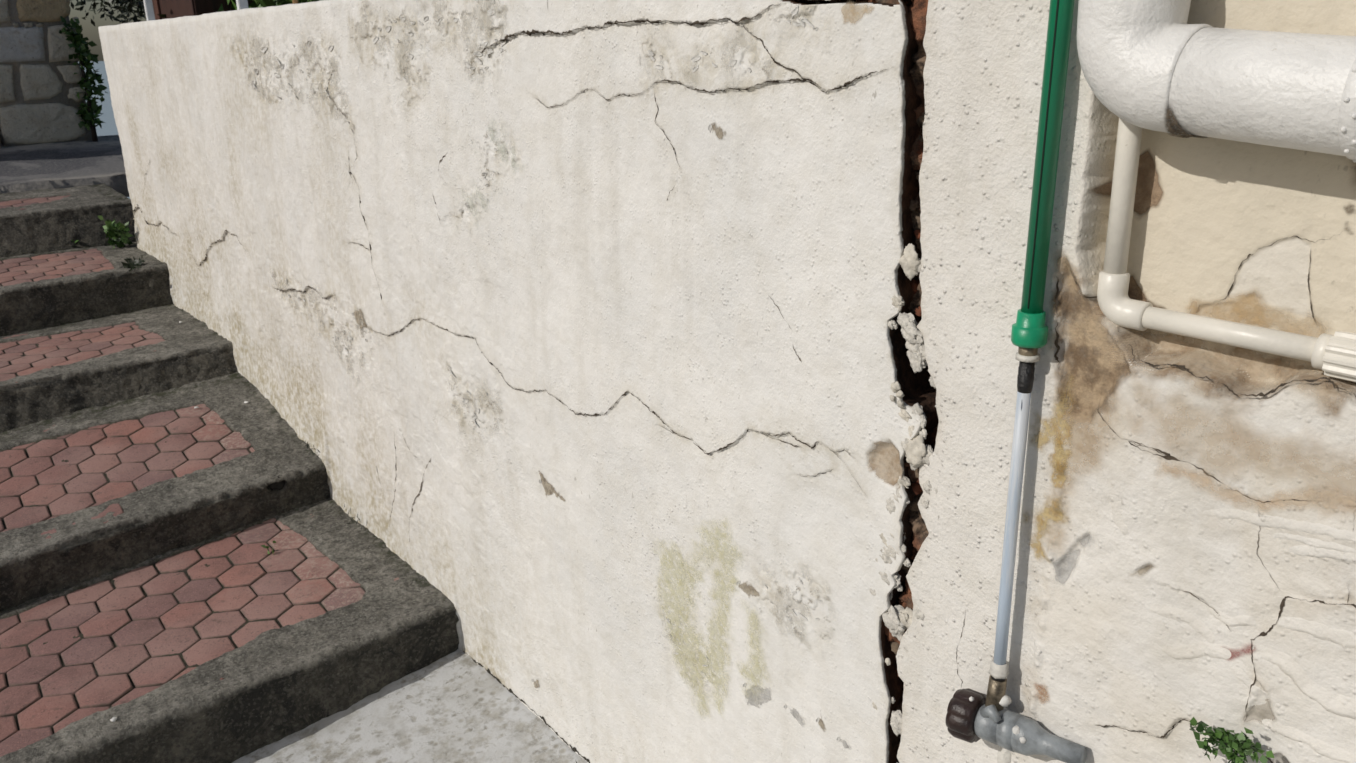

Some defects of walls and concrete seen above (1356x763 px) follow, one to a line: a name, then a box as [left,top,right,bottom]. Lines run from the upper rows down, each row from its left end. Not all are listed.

spalling [1093,181,1112,196]
spalling [1133,151,1163,215]
spalling [1128,276,1160,308]
crack [326,0,938,763]
crack [1098,402,1356,720]
water stain [662,528,735,710]
crack [1097,719,1188,738]